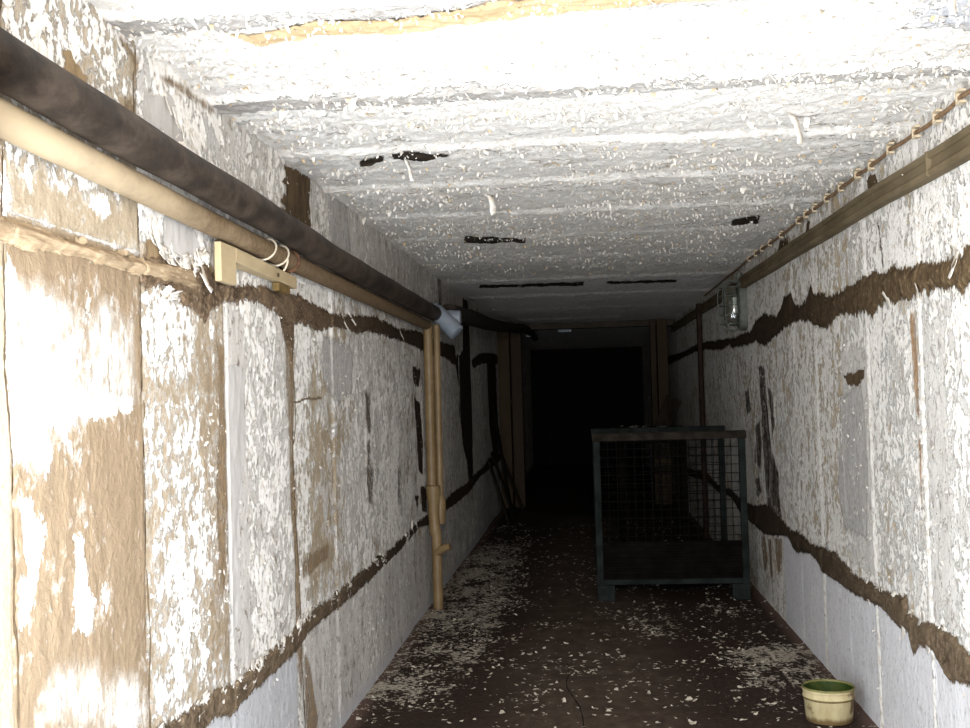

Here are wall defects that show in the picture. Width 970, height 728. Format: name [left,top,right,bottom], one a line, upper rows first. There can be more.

peeling [63,49,87,83]
peeling [0,147,36,217]
peeling [53,171,70,195]
peeling [89,191,111,219]
peeling [114,0,970,295]
peeling [0,253,133,481]
crack [290,368,322,491]
spalling [47,212,803,728]
spalling [668,184,970,697]
peeling [16,489,47,631]
crack [294,515,302,619]